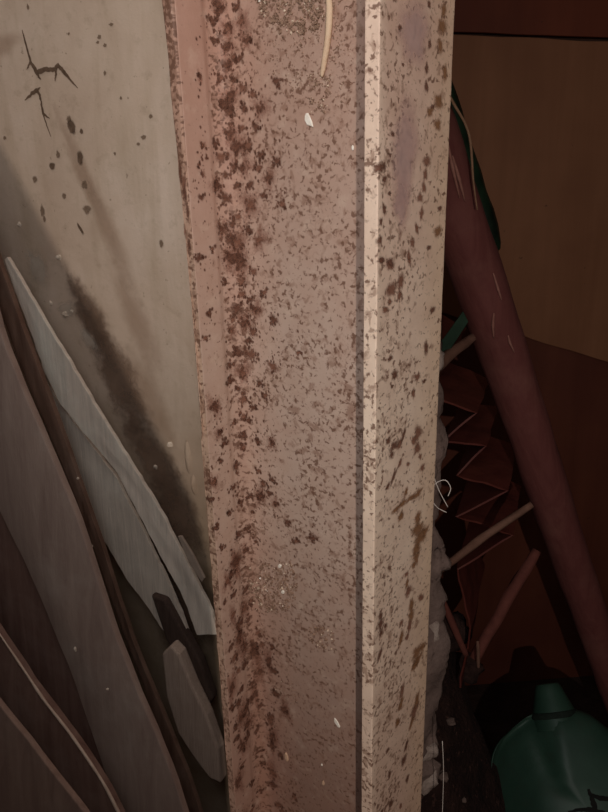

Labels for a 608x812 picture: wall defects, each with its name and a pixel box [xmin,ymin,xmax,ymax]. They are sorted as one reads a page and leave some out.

corrosion [428,4,446,53]
crack [22,30,78,136]
corrosion [428,95,443,129]
corrosion [407,157,430,264]
corrosion [383,275,404,313]
corrosion [179,0,298,812]
corrosion [386,426,424,489]
corrosion [392,489,422,521]
corrosion [399,512,429,645]
corrosion [412,643,425,671]